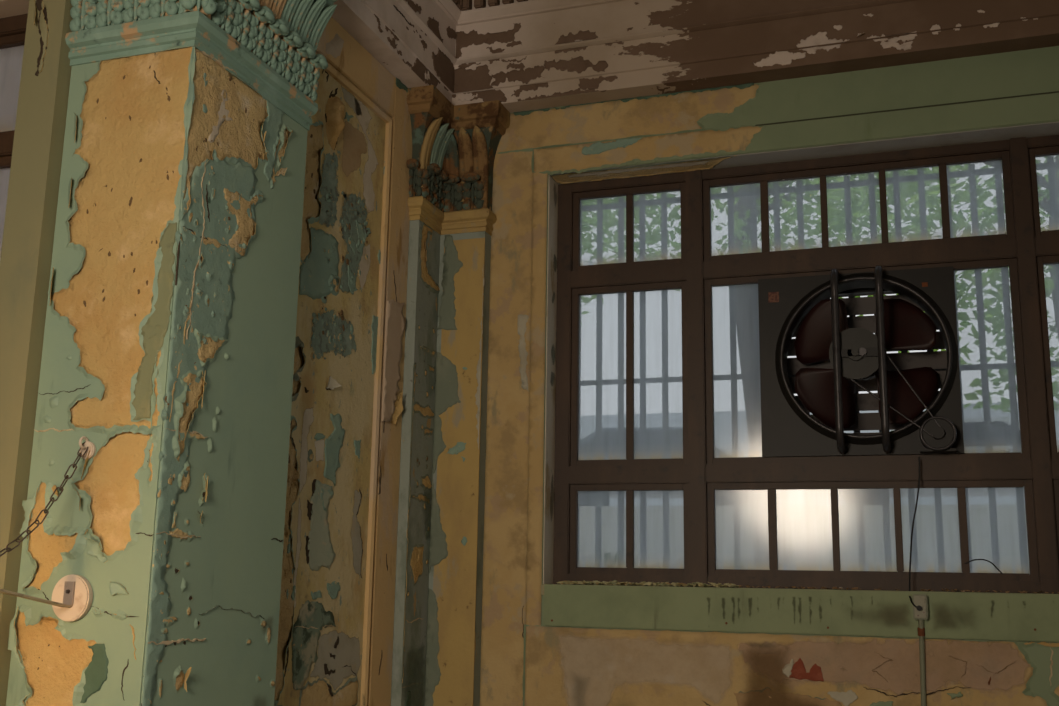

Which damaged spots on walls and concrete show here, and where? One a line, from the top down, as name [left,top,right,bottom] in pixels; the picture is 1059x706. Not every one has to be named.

flaking render [8,46,293,706]
peeling [292,86,385,402]
flaking render [374,0,1059,706]
crack [91,605,264,700]
flaking render [255,414,361,706]
peeling [351,489,363,578]
damp [747,654,804,706]